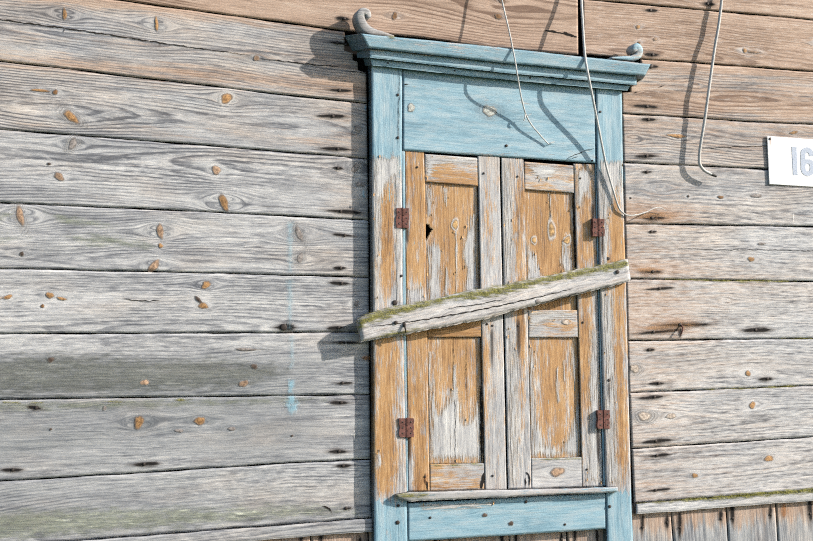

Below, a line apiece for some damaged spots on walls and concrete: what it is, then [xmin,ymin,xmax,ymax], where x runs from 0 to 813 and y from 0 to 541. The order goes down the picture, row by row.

peeling [373,155,401,306]
peeling [396,156,479,304]
peeling [502,163,514,285]
peeling [526,240,542,279]
peeling [528,164,560,181]
peeling [560,240,572,272]
peeling [575,160,623,220]
peeling [428,354,481,463]
peeling [508,328,531,487]
peeling [528,292,620,484]